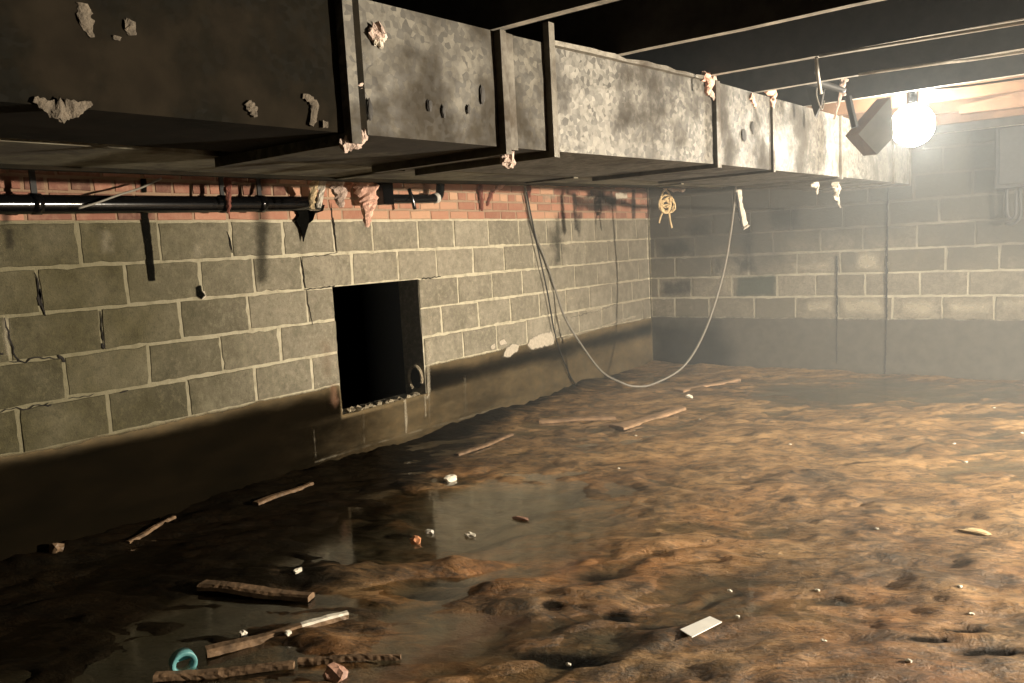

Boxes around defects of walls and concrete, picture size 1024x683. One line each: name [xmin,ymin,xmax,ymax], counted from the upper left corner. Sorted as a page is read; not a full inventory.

crack [300,205,338,324]
crack [34,272,46,316]
crack [0,318,66,363]
crack [98,311,106,349]
crack [0,394,93,413]
damp [0,316,1024,561]